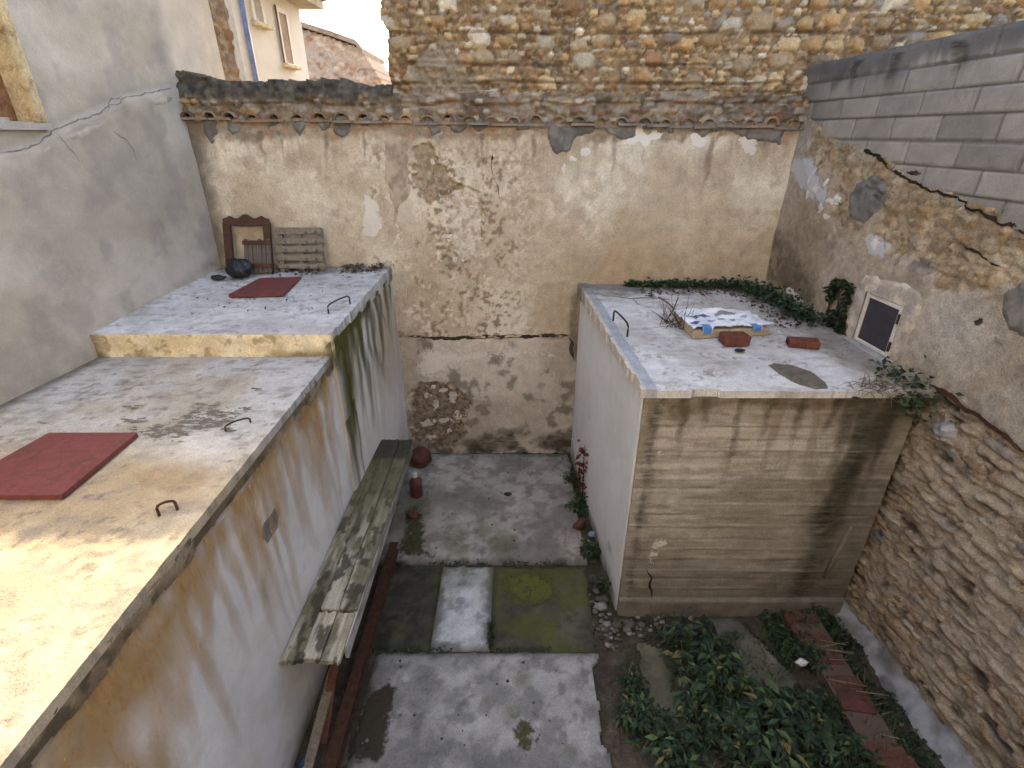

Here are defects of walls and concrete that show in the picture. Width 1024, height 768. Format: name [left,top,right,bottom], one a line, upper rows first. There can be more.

crack [0,88,171,163]
flaking render [361,194,382,238]
flaking render [414,145,485,263]
peeling [790,155,841,220]
crack [864,149,1024,234]
crack [963,245,1004,268]
damp [326,283,391,470]
crack [408,333,574,359]
flaking render [407,382,471,451]
damp [648,538,667,564]